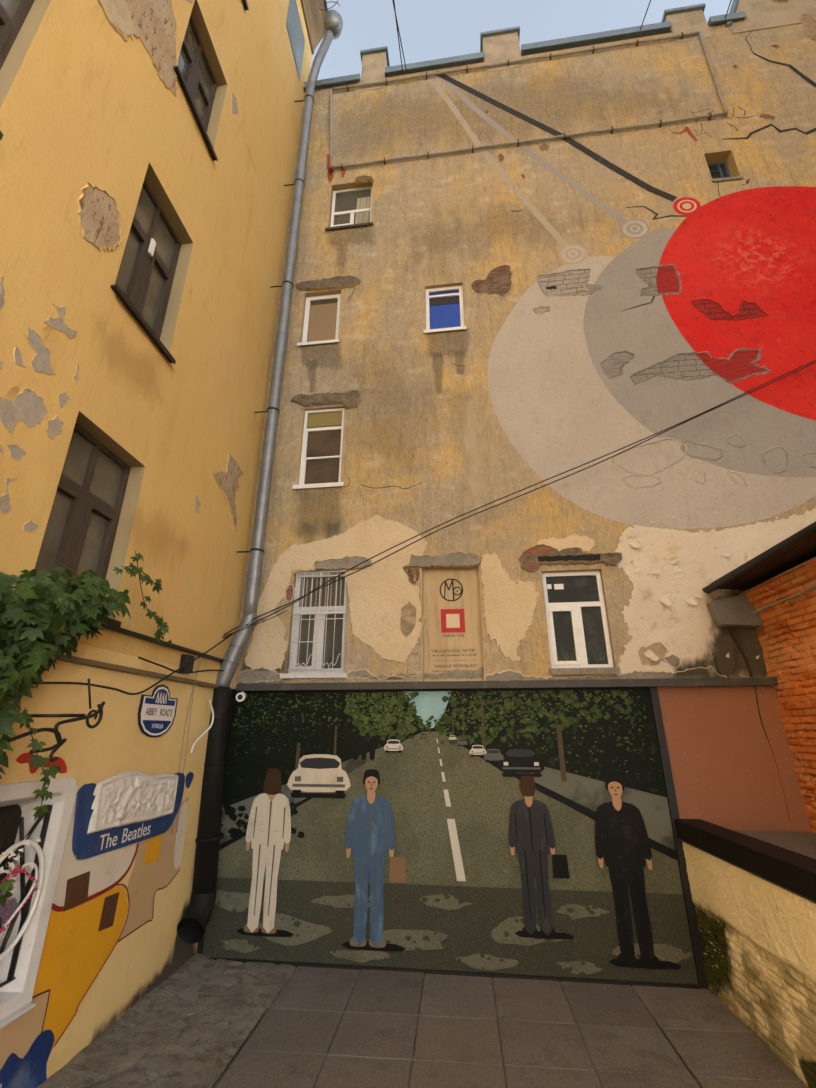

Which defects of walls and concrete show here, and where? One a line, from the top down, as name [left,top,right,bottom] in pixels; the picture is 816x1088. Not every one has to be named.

spalling [97,0,178,98]
spalling [76,182,122,253]
flaking render [468,264,515,299]
peeling [0,303,77,376]
peeling [0,386,71,461]
peeling [0,478,17,514]
spalling [212,453,244,532]
peeling [239,507,816,684]